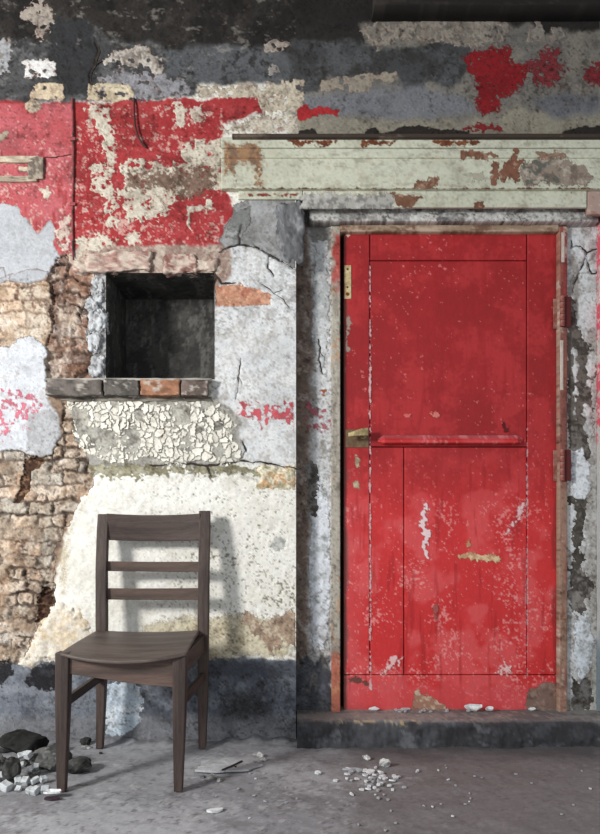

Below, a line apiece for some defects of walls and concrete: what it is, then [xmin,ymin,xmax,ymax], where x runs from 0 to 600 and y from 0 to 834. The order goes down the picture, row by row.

peeling [20,0,56,42]
peeling [0,37,15,75]
peeling [360,21,570,133]
peeling [460,148,594,188]
flaking render [0,44,340,382]
crack [213,225,295,308]
crack [150,441,299,478]
flaking render [0,388,296,664]
peeling [419,502,431,559]
spalling [567,295,597,710]
damp [144,614,198,632]
damp [209,614,290,658]